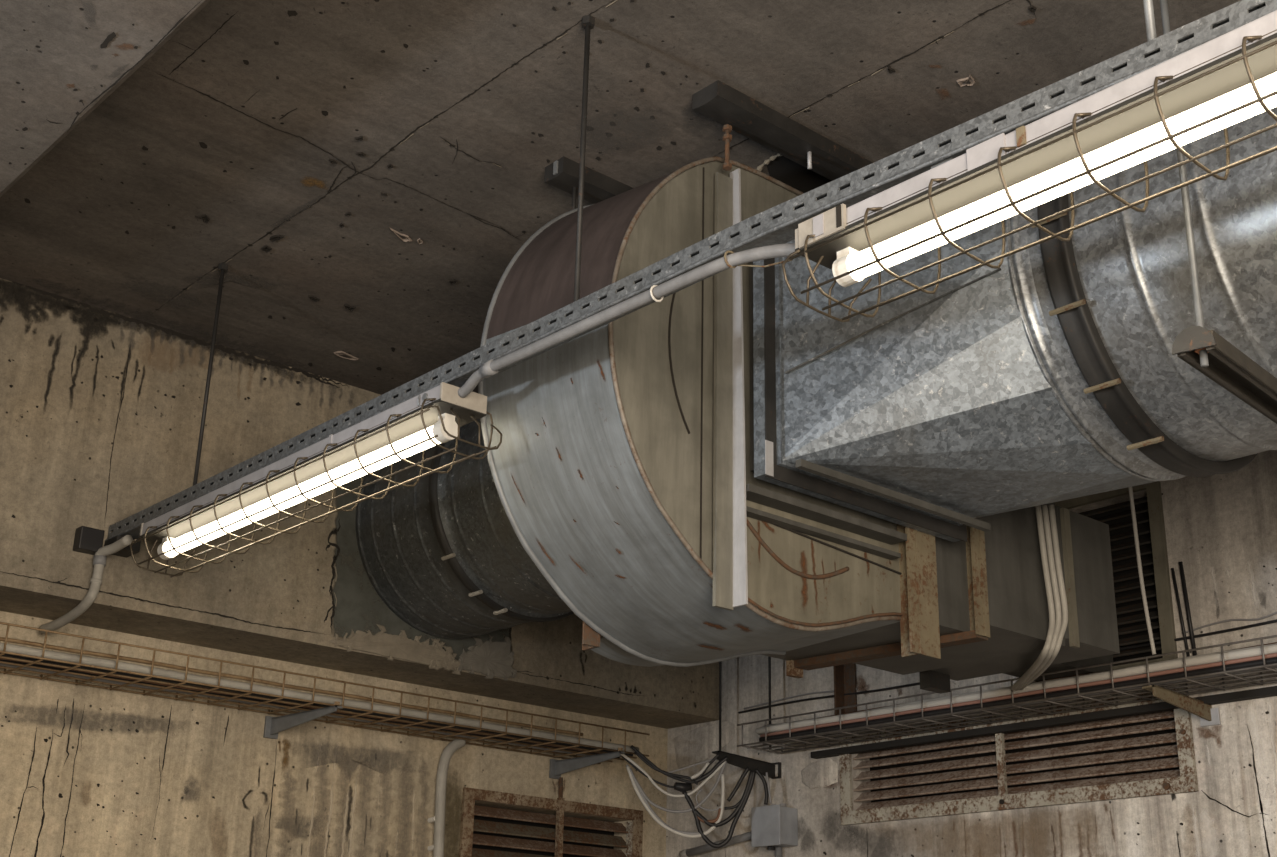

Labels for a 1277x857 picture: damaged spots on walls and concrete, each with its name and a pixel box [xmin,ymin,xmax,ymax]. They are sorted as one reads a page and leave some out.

crack [12,0,617,527]
damp [0,280,145,406]
peeling [365,624,463,675]
damp [242,768,268,857]
damp [283,744,387,857]
damp [444,783,462,857]
crack [1201,726,1270,857]